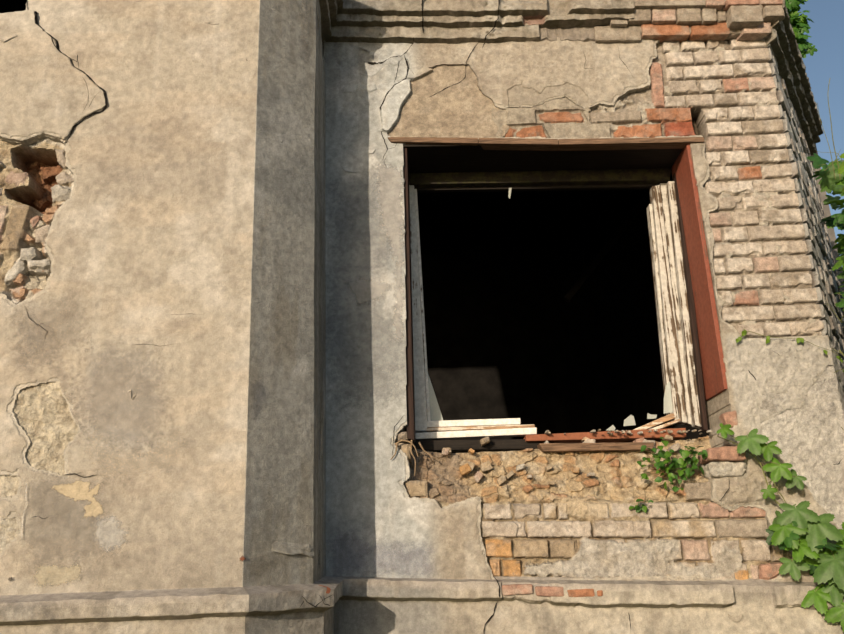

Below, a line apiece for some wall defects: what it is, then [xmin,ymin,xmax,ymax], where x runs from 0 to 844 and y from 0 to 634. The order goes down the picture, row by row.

crack [27,2,108,143]
crack [364,0,424,169]
crack [430,0,500,97]
flaking render [0,137,74,304]
flaking render [379,38,824,339]
spalling [13,382,103,517]
flaking render [396,429,792,597]
crack [483,578,500,632]